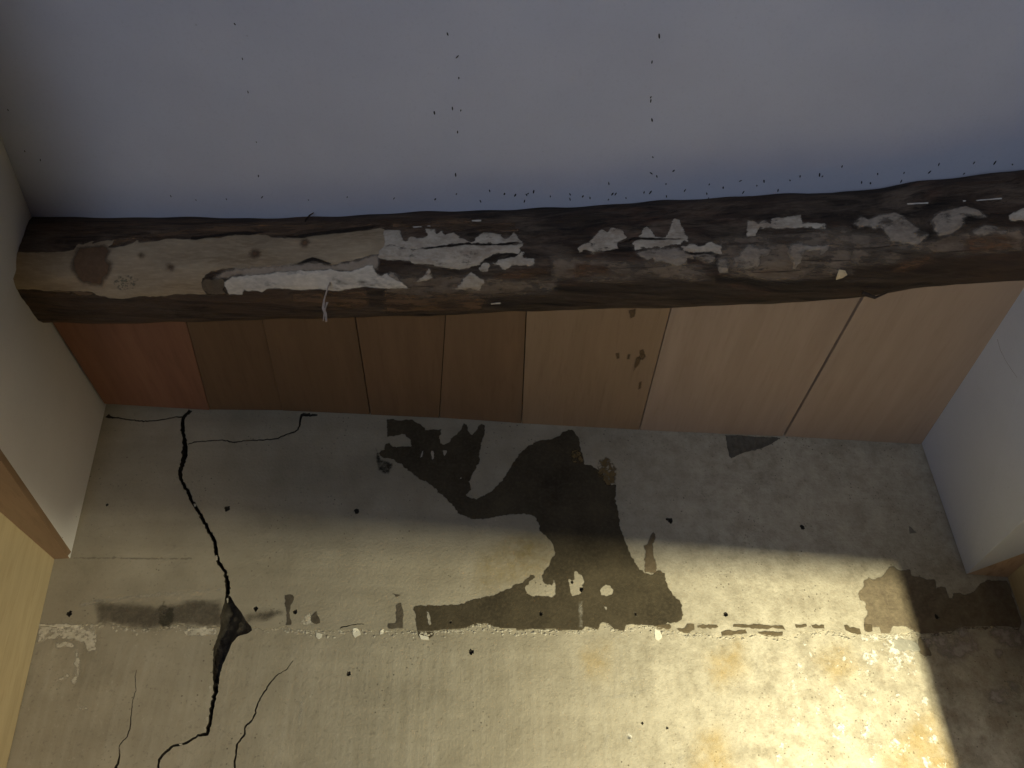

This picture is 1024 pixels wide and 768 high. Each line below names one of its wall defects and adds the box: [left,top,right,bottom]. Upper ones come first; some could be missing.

peeling [378,229,535,291]
peeling [578,215,830,273]
peeling [854,206,1024,245]
spalling [725,435,780,458]
leakage [376,419,683,638]
leakage [98,601,221,628]
crack [106,409,318,768]
leakage [837,566,1021,678]
leakage [832,697,937,765]